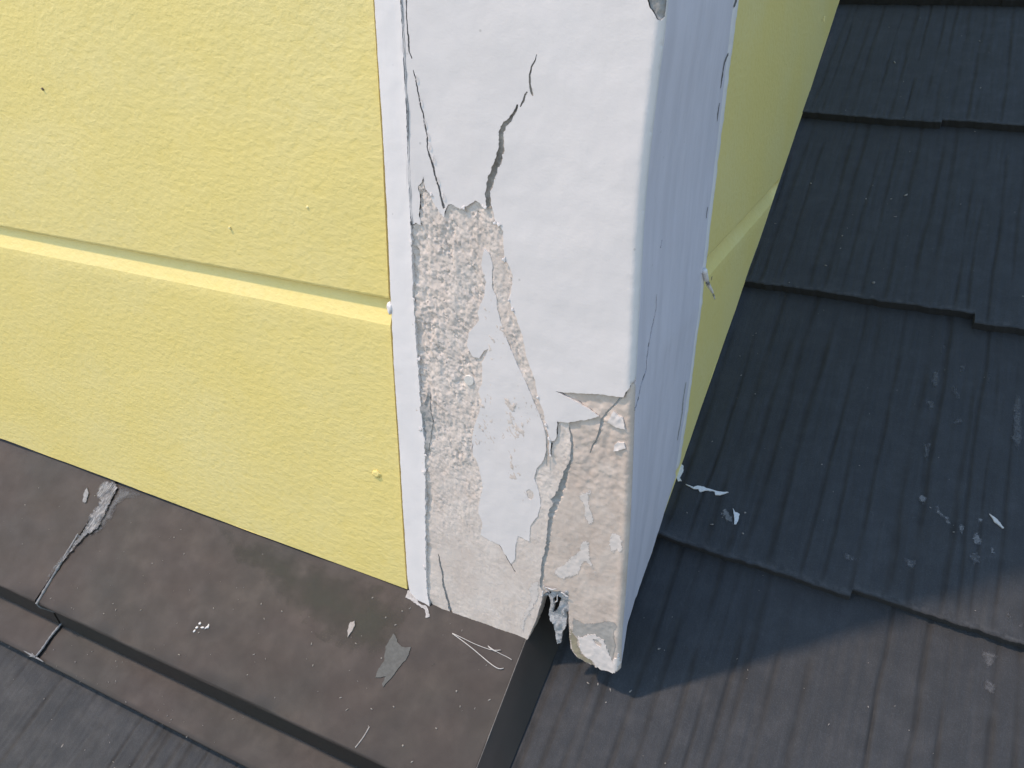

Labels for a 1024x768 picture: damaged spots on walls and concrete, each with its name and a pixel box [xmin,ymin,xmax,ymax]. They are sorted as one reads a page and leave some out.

crack [400,0,445,225]
crack [485,54,537,208]
flaking render [409,178,635,673]